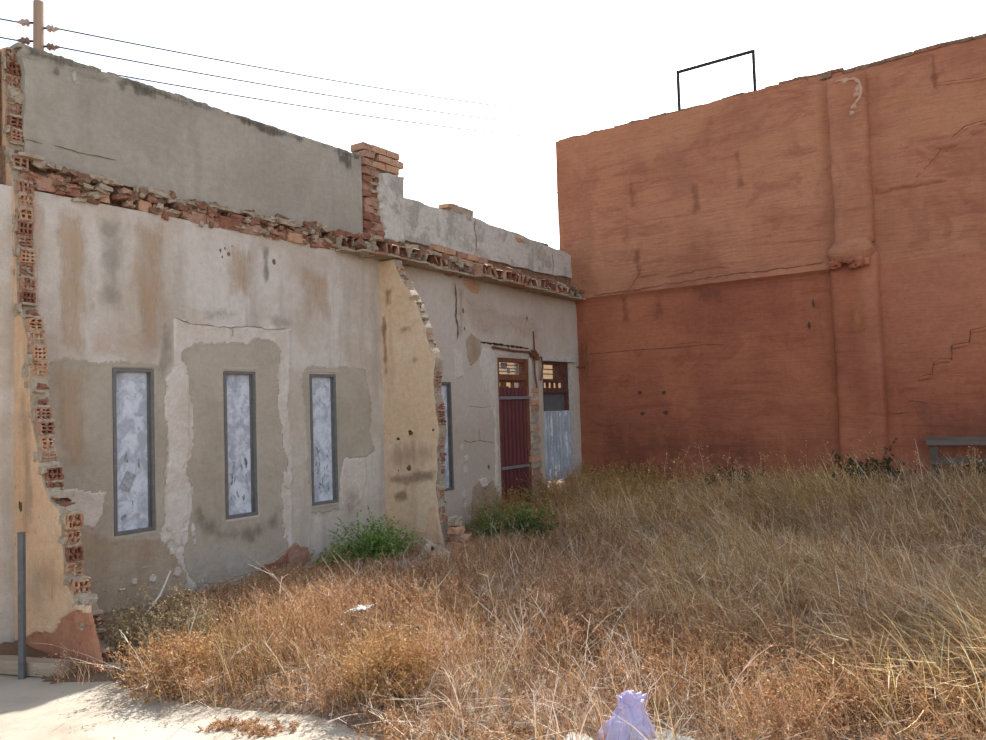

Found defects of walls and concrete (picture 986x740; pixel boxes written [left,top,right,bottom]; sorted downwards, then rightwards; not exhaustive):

peeling [837,77,863,116]
crack [595,262,823,295]
peeling [0,47,374,672]
crack [895,326,986,415]
spalling [411,364,450,550]